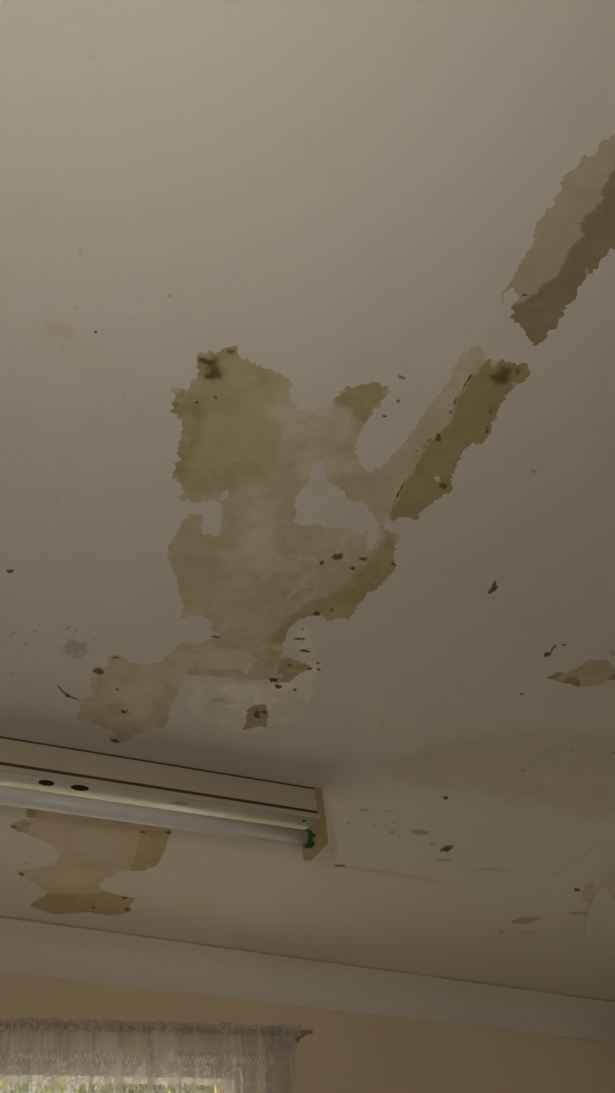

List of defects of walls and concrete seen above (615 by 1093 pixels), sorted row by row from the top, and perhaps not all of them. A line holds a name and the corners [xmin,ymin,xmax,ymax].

peeling [501,134,615,346]
peeling [75,345,531,743]
peeling [548,650,615,687]
peeling [10,808,172,918]